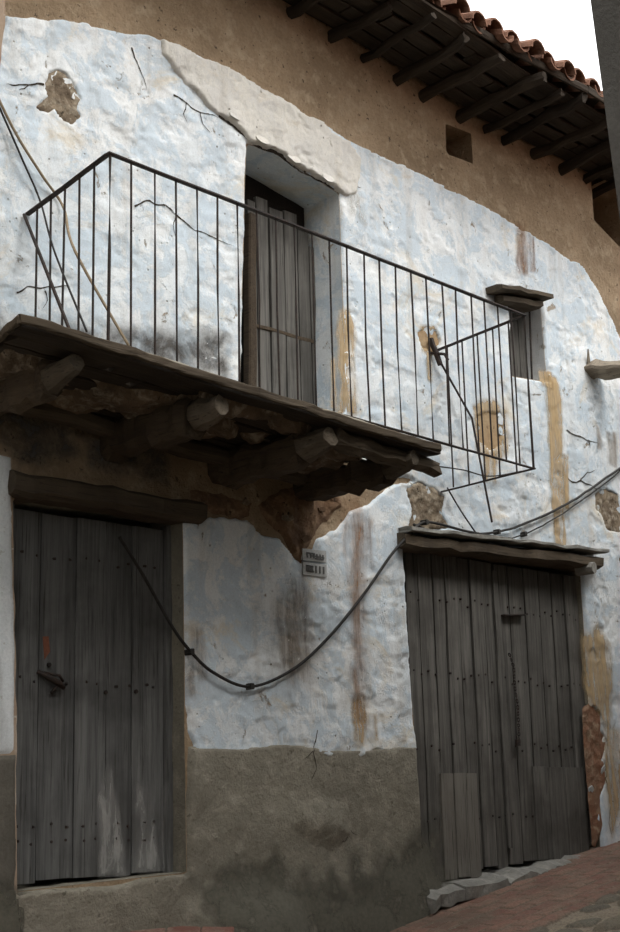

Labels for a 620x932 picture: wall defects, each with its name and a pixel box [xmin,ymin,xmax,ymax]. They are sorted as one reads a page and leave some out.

flaking render [36,70,80,124]
flaking render [406,482,448,530]
flaking render [595,489,620,532]
damp [583,627,620,829]
flaking render [582,704,607,847]